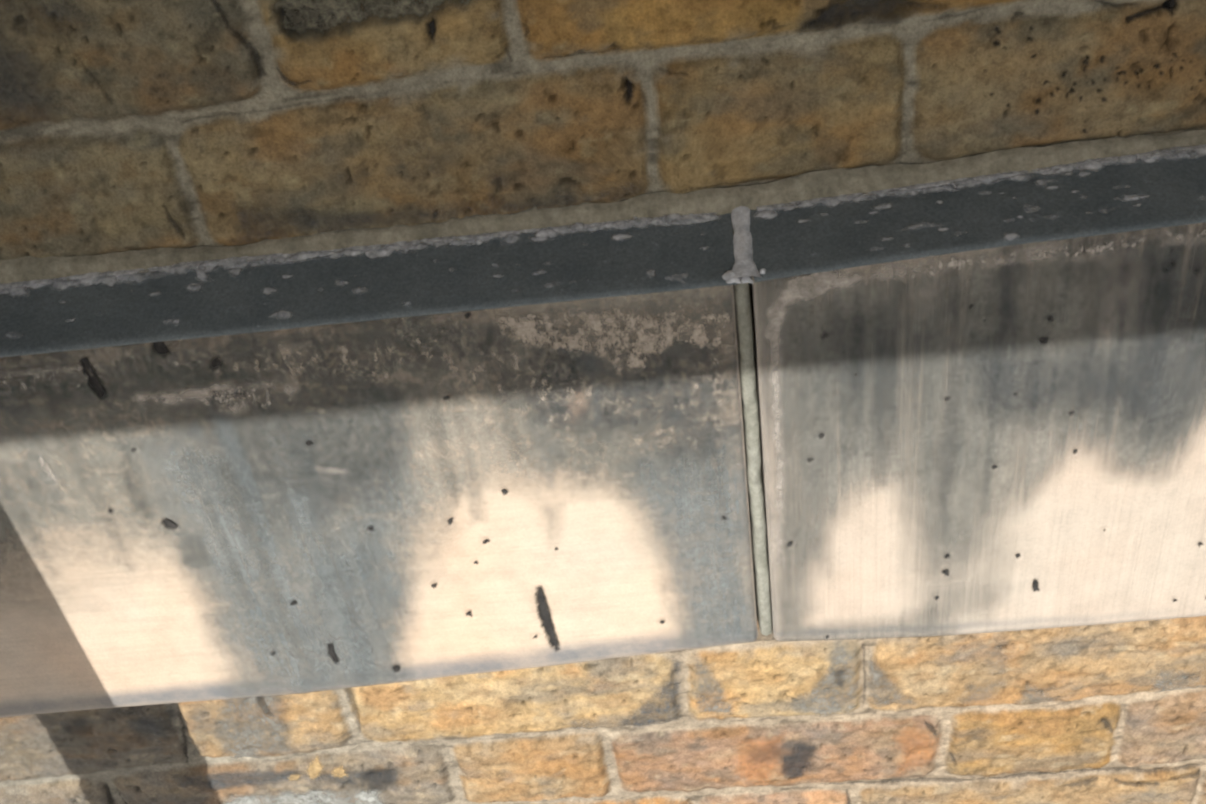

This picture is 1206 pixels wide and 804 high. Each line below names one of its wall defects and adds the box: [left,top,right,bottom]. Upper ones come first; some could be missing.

leakage [0,213,717,303]
leakage [0,289,753,689]
leakage [761,227,1206,634]